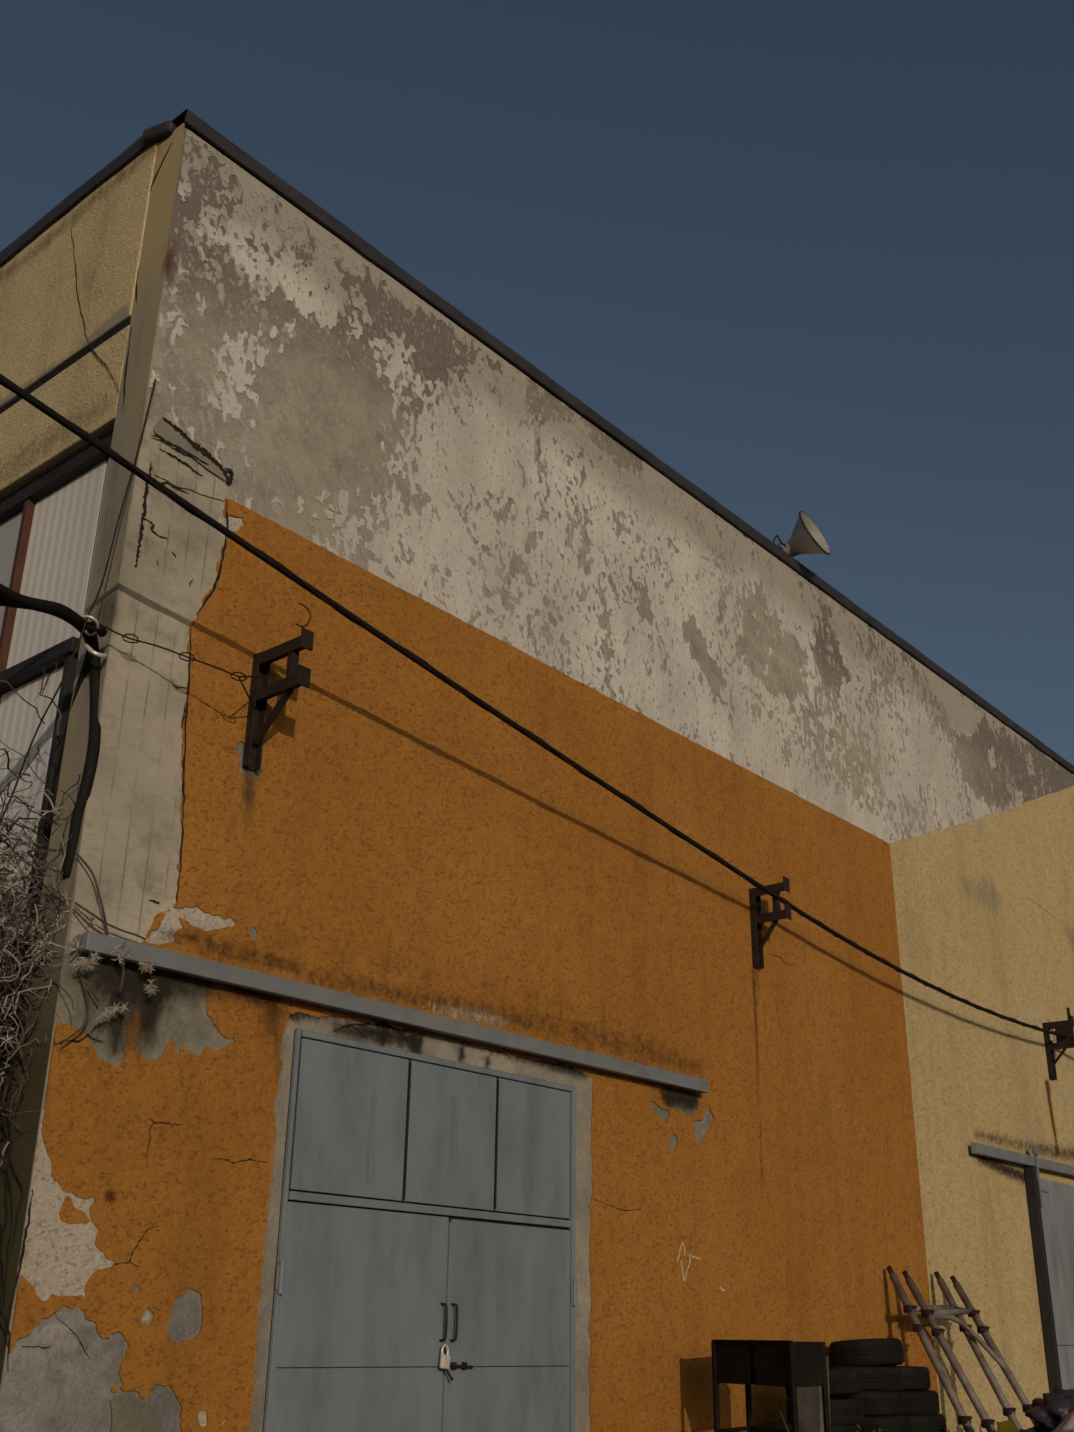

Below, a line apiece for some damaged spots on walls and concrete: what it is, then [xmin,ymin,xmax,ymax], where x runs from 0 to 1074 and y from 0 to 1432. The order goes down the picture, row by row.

crack [150,143,172,192]
crack [71,229,139,410]
peeling [140,128,1074,840]
crack [135,417,234,904]
spalling [138,899,257,945]
spalling [54,935,234,1067]
spalling [649,1089,712,1147]
rust [1046,1081,1060,1155]
spalling [0,1110,180,1432]
spalling [170,1291,201,1340]
spalling [198,1410,226,1427]